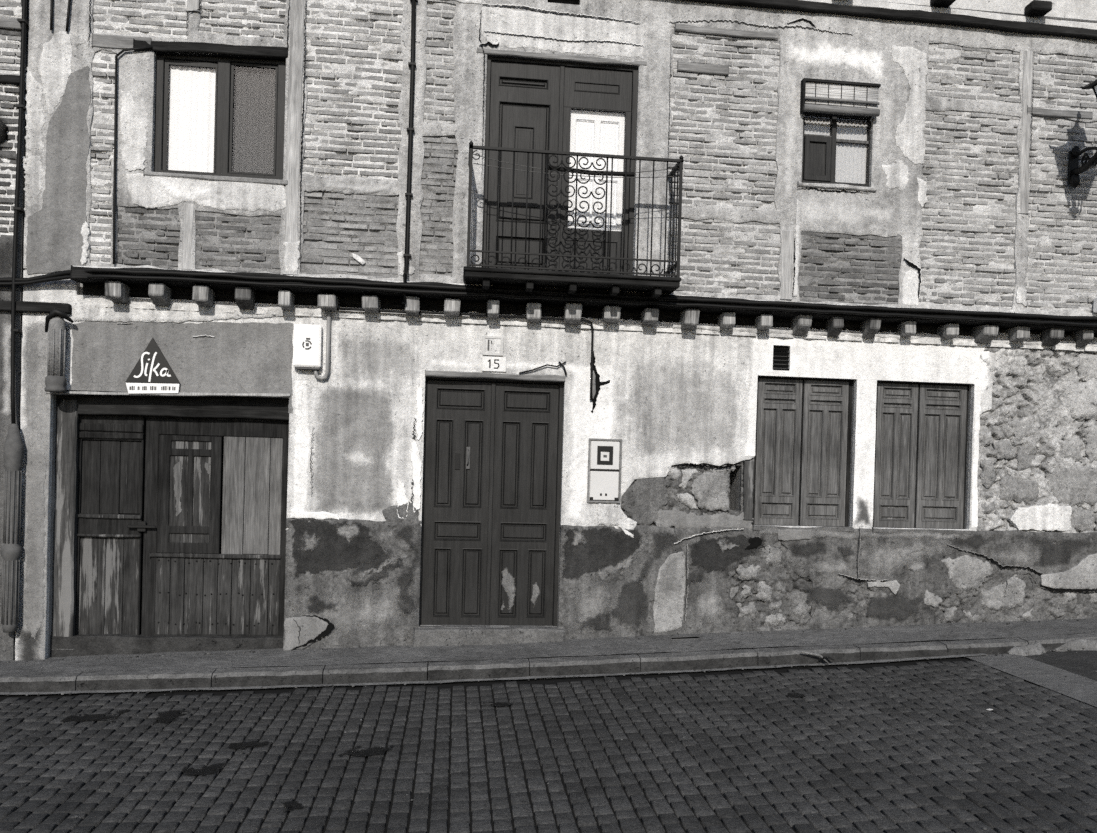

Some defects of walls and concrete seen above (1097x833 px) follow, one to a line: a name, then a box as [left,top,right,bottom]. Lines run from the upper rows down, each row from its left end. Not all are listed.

peeling [882,45,928,208]
crack [902,257,922,306]
peeling [501,568,515,610]
spalling [562,461,1097,633]
crack [947,544,1045,594]